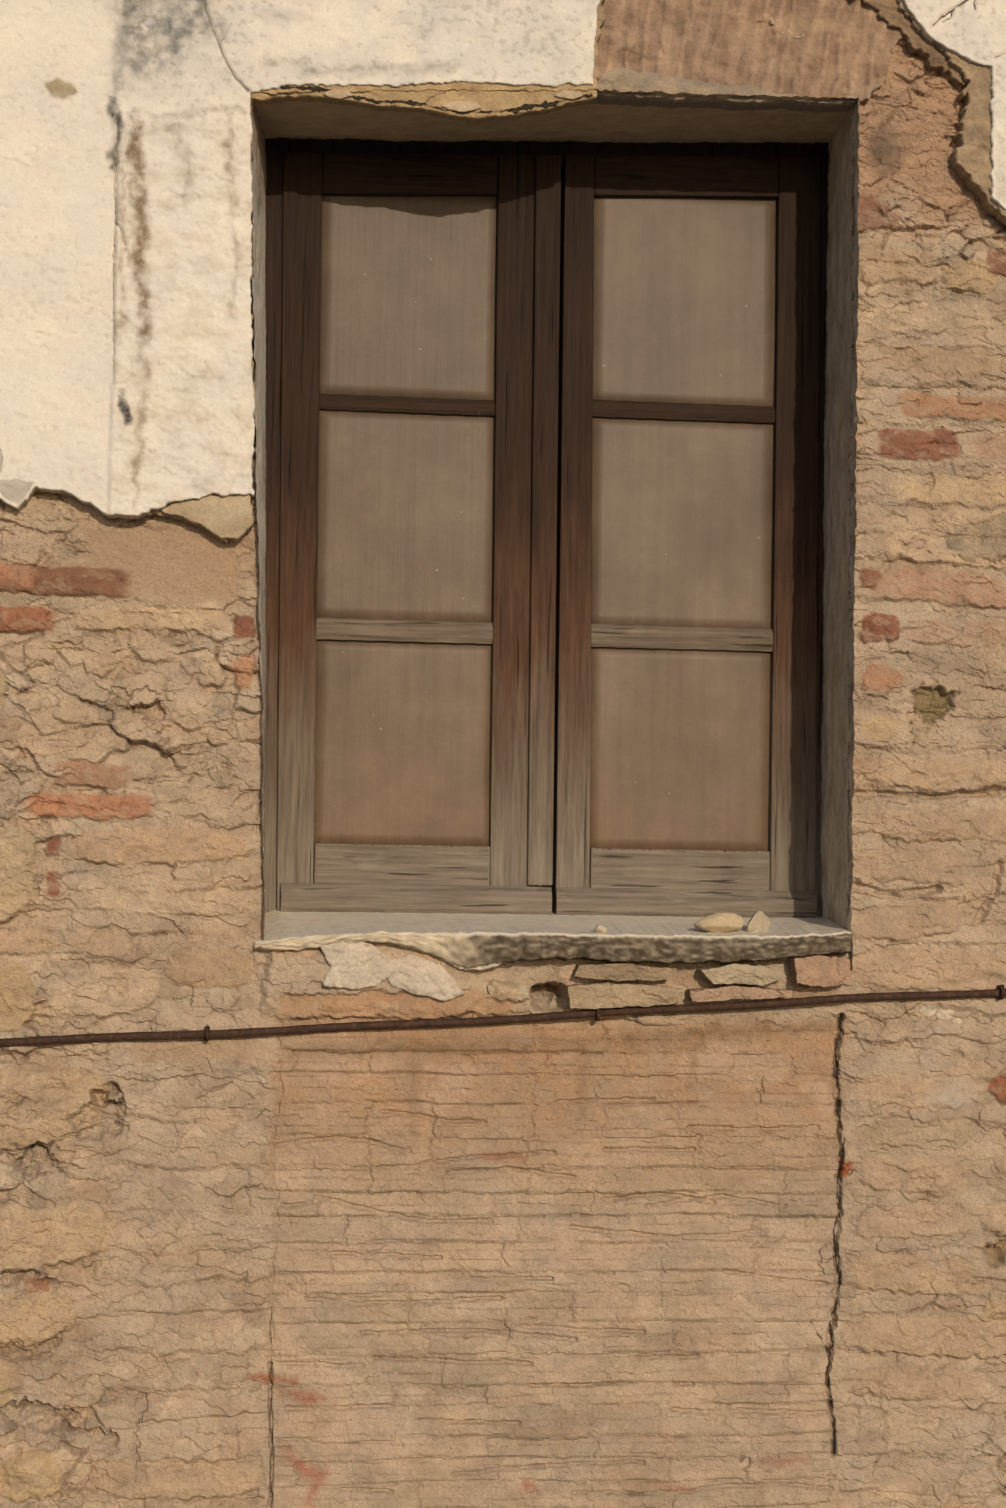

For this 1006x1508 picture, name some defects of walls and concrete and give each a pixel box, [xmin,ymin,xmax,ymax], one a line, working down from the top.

crack [933,0,976,25]
peeling [46,79,76,97]
crack [206,11,593,115]
spalling [250,0,965,123]
water stain [109,96,142,175]
water stain [132,193,149,335]
water stain [119,399,132,423]
peeling [0,450,32,501]
spalling [292,940,503,1001]
spalling [564,955,851,1009]
spalling [919,1004,963,1024]
crack [811,1013,860,1455]